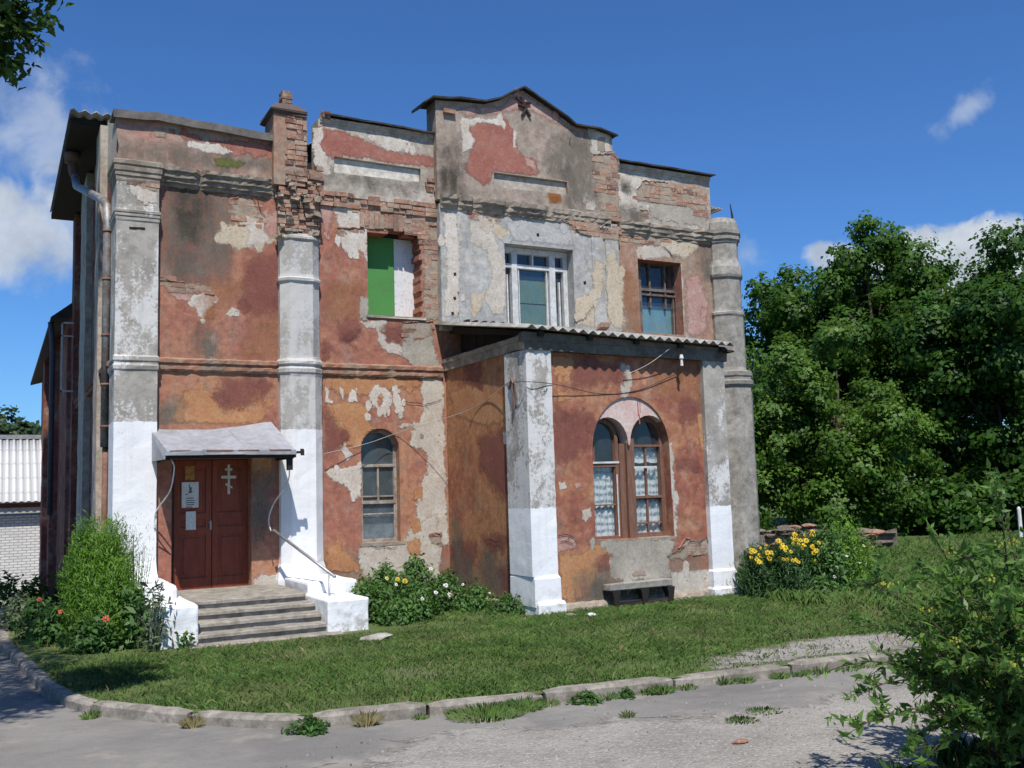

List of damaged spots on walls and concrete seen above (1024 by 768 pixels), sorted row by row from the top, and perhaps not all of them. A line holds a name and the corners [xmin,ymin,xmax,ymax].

damp [162,187,235,280]
peeling [214,195,277,253]
spalling [158,275,219,359]
peeling [306,90,709,603]